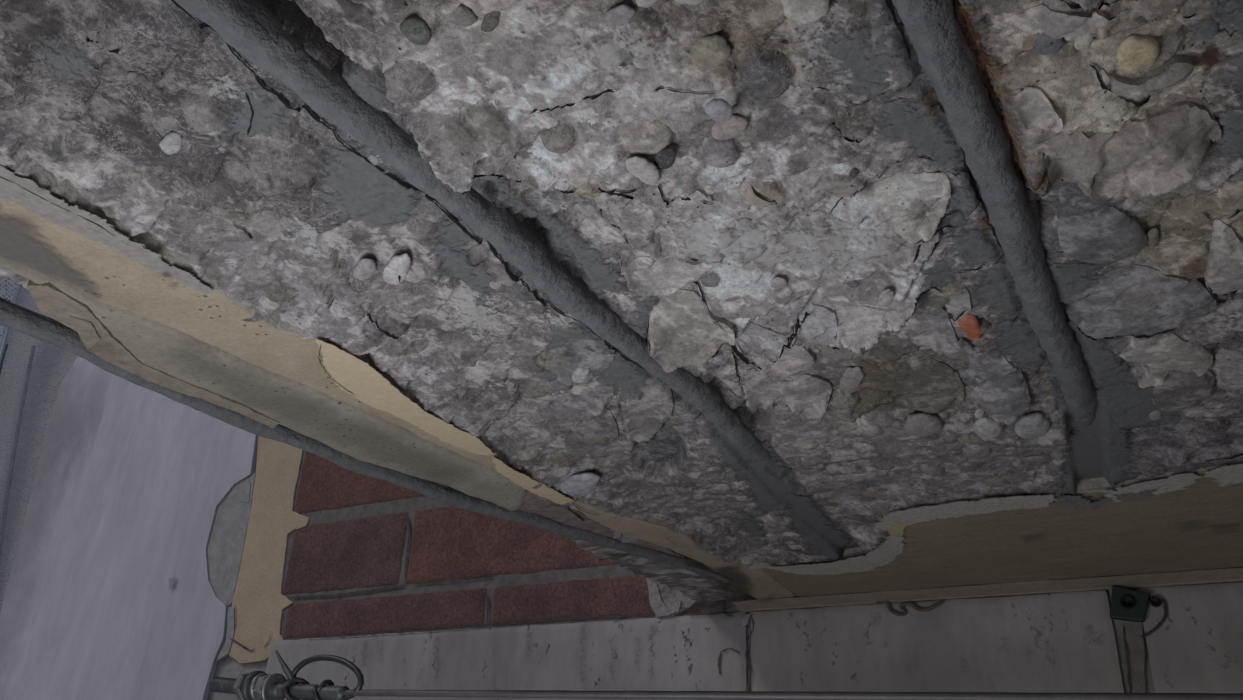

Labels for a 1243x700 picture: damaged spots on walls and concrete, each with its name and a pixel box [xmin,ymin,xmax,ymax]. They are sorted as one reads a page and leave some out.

crack [171,0,714,383]
spalling [0,0,1079,619]
crack [688,255,810,402]
crack [912,286,965,321]
spalling [874,0,1243,503]